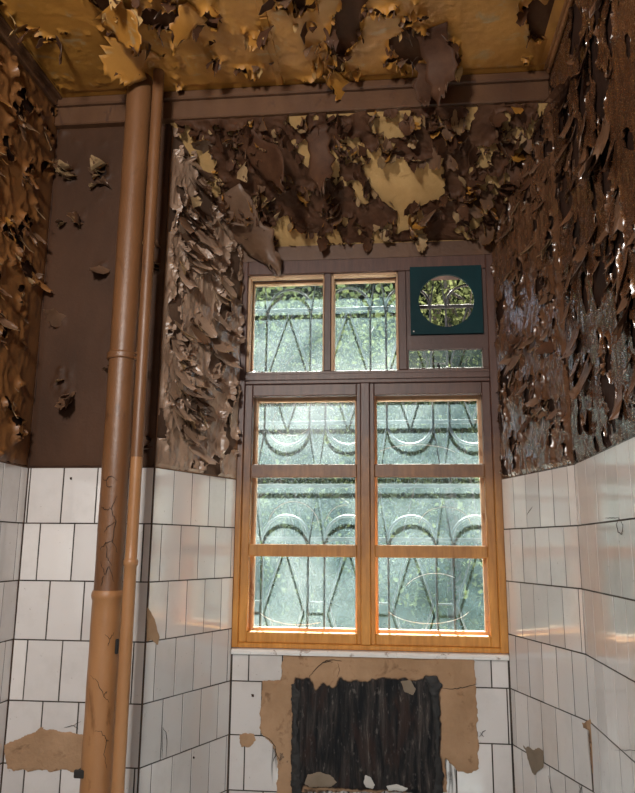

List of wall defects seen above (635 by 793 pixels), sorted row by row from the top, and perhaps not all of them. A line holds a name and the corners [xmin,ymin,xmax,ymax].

peeling [0,0,635,479]
peeling [146,608,160,645]
peeling [239,655,486,793]
peeling [4,727,83,772]
peeling [523,745,544,775]